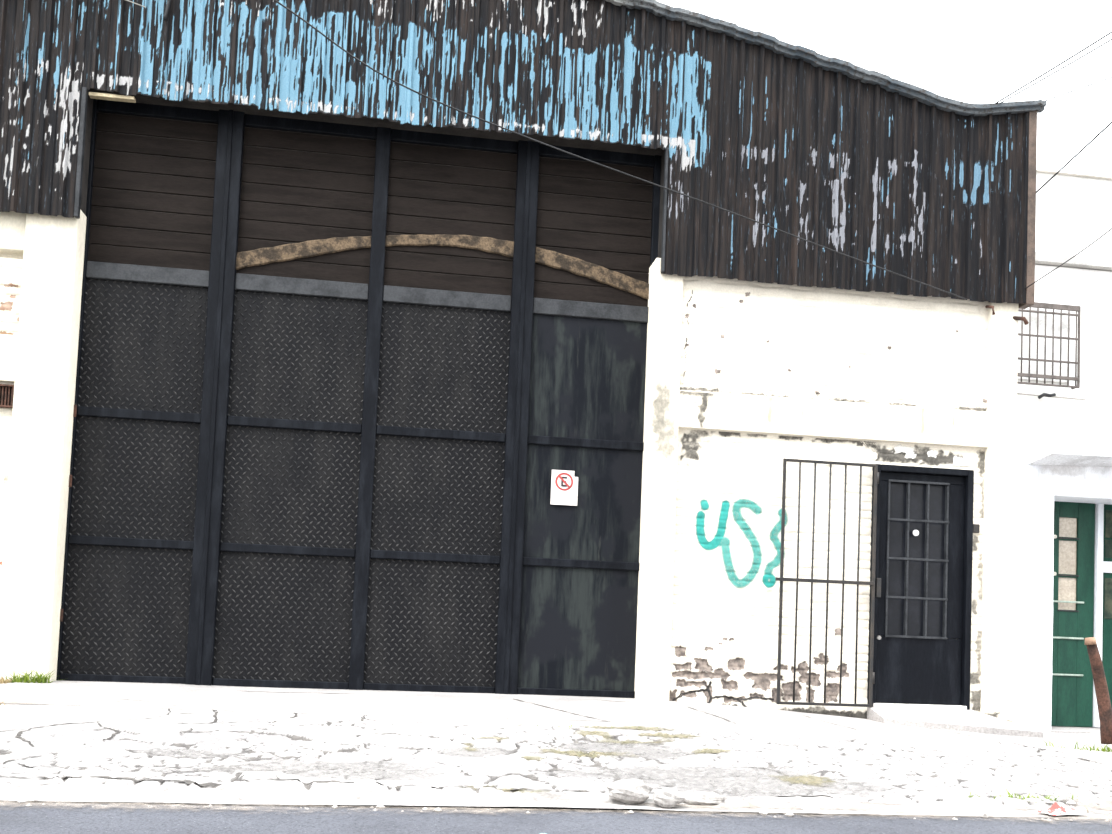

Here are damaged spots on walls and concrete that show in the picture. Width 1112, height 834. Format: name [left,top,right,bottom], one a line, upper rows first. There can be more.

peeling [2,0,723,219]
peeling [728,76,814,264]
peeling [810,92,857,252]
peeling [855,150,934,285]
peeling [941,124,1013,279]
peeling [0,283,19,321]
peeling [894,444,938,459]
peeling [953,452,985,474]
peeling [669,637,849,705]
peeling [970,635,981,712]
crack [0,692,1112,806]